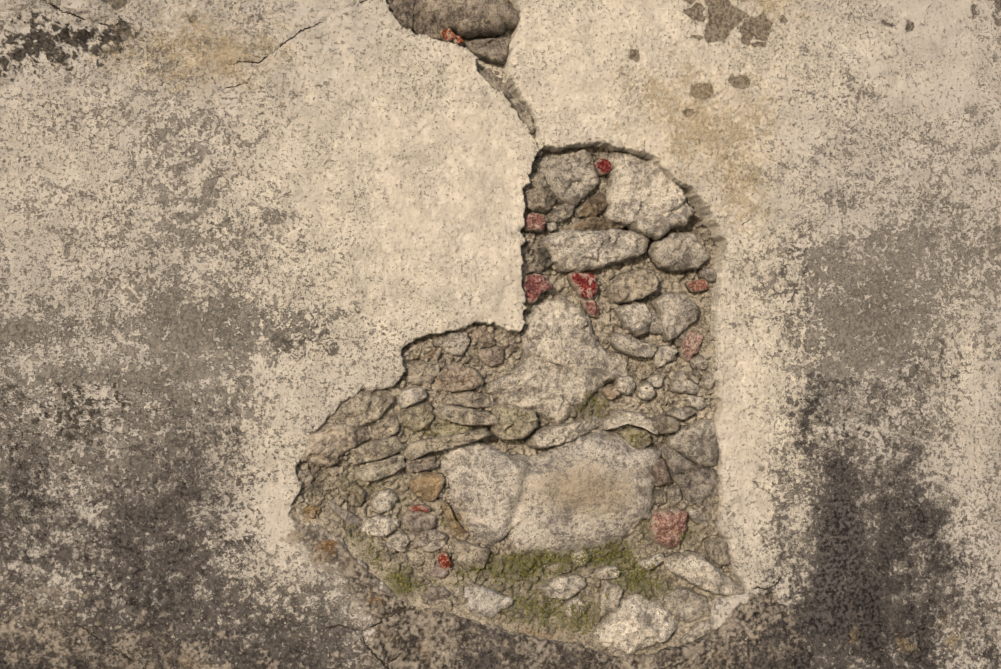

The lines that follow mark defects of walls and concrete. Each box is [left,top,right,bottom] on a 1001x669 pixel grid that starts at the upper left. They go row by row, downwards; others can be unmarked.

crack [223,22,321,90]
spalling [386,0,536,138]
peeling [683,82,714,117]
peeling [683,0,788,47]
peeling [728,73,751,89]
peeling [882,20,914,32]
peeling [24,81,339,442]
spalling [289,146,1001,657]
water stain [0,364,275,669]
water stain [713,369,983,669]
water stain [436,621,598,669]
water stain [977,619,1001,669]